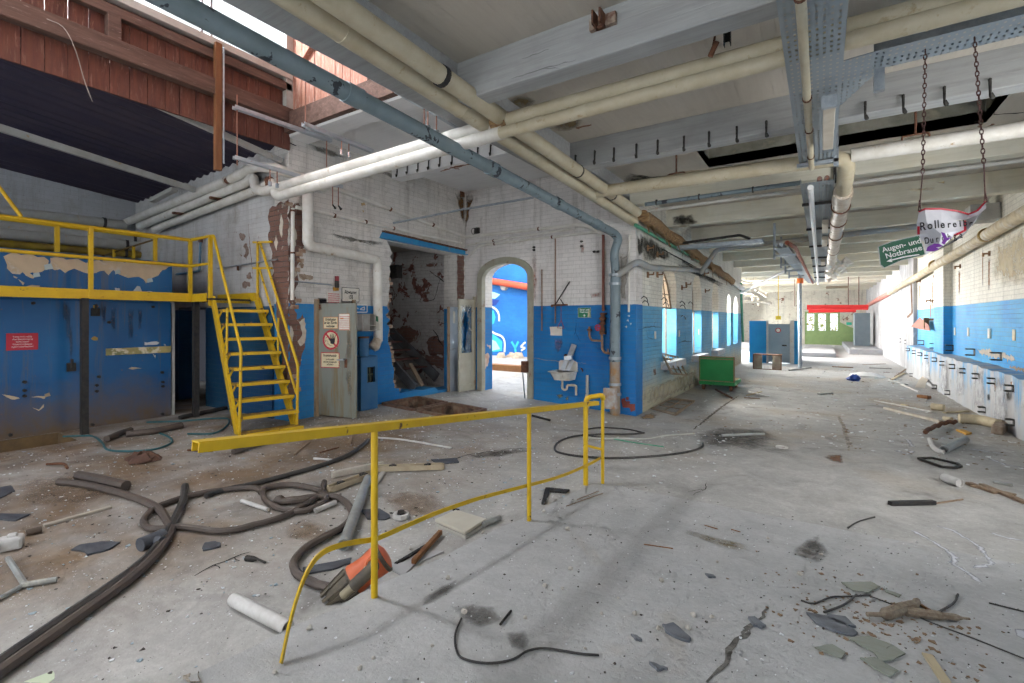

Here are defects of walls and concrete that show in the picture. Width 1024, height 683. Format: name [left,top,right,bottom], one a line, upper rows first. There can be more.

peeling [3,253,170,292]
flaking render [268,199,313,405]
flaking render [457,255,465,300]
damp [620,237,668,299]
flaking render [386,277,481,415]
peeling [543,397,734,493]
crack [706,608,769,682]